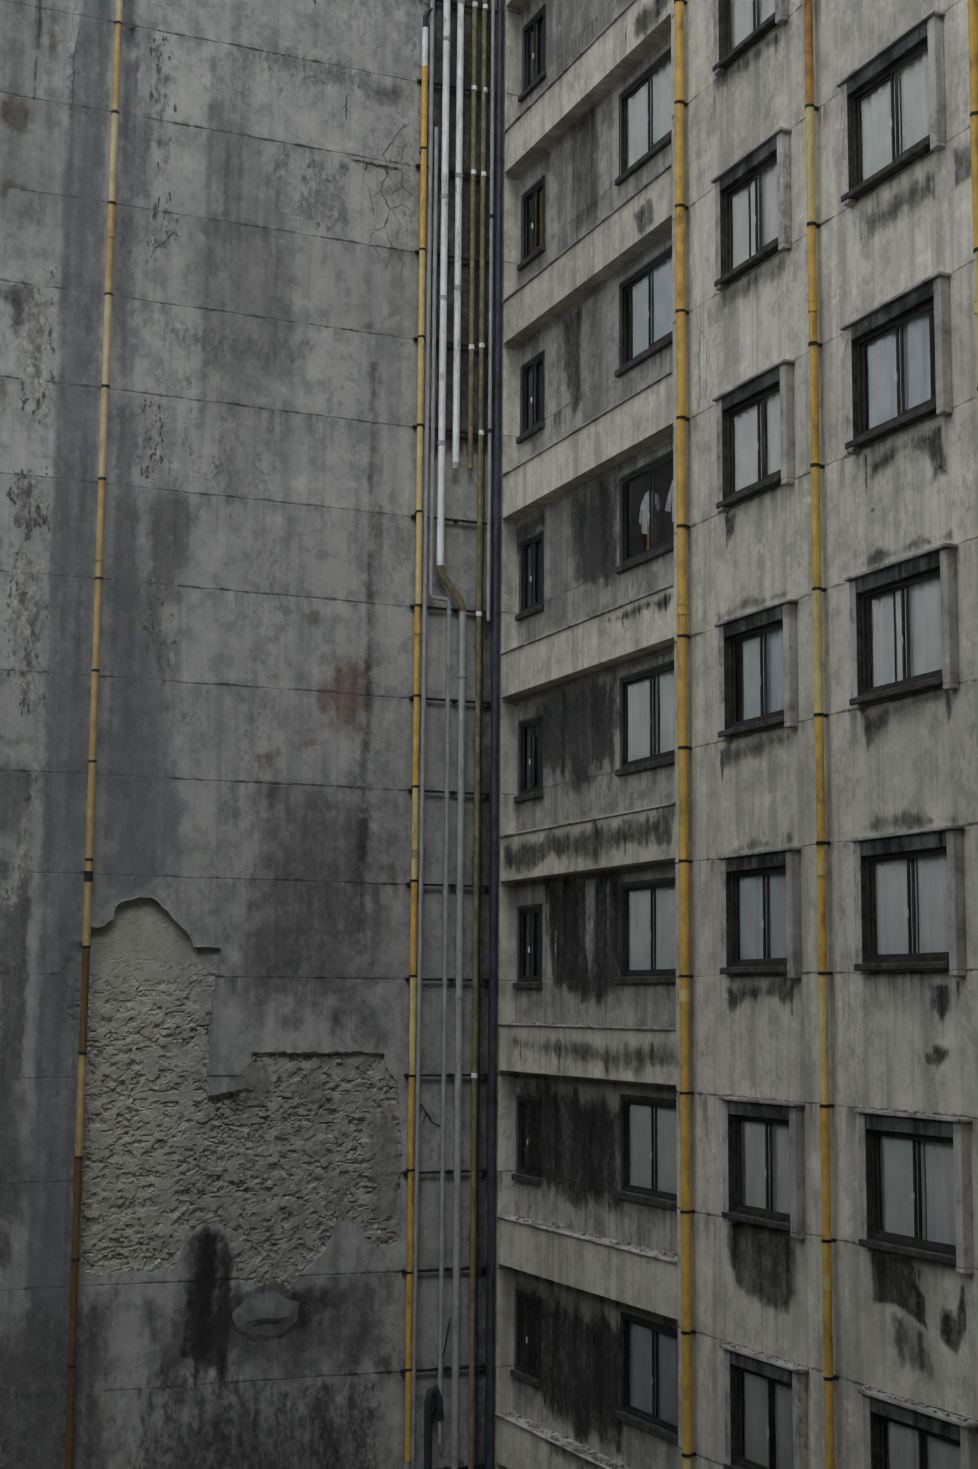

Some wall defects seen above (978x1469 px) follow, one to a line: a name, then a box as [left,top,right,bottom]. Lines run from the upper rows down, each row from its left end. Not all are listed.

damp [622,594,671,627]
flaking render [60,894,402,1288]
damp [473,614,674,1469]
damp [156,1229,374,1389]